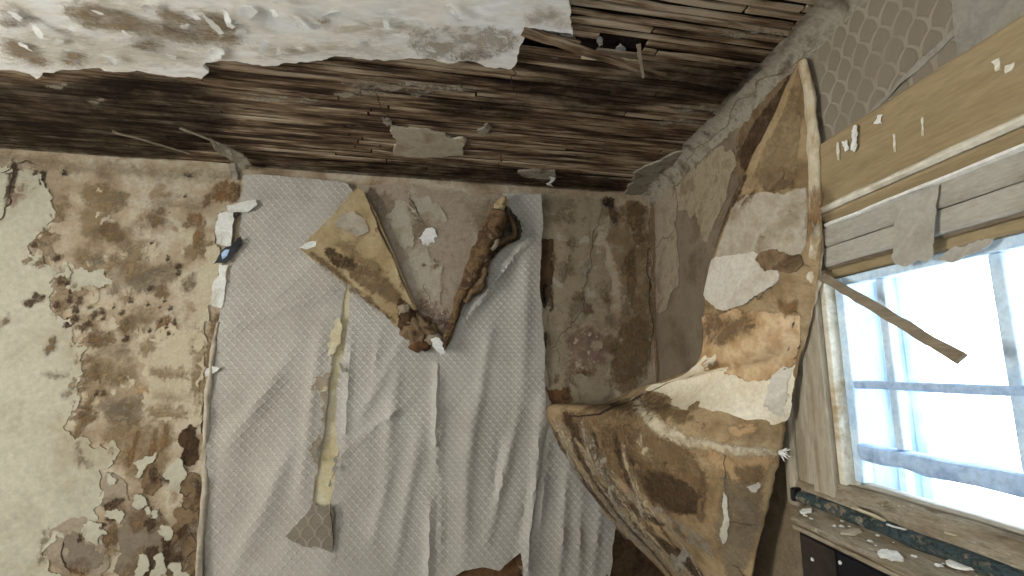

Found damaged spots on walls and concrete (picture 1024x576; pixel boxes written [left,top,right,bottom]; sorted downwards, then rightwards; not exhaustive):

peeling [64,3,247,51]
peeling [409,26,516,63]
damp [10,170,46,206]
peeling [0,166,209,576]
damp [55,183,219,429]
peeling [309,318,348,464]
flaking render [335,184,502,337]
crack [548,203,603,364]
damp [552,201,777,576]
peeling [842,125,858,152]
damp [102,517,119,558]
damp [143,454,201,576]